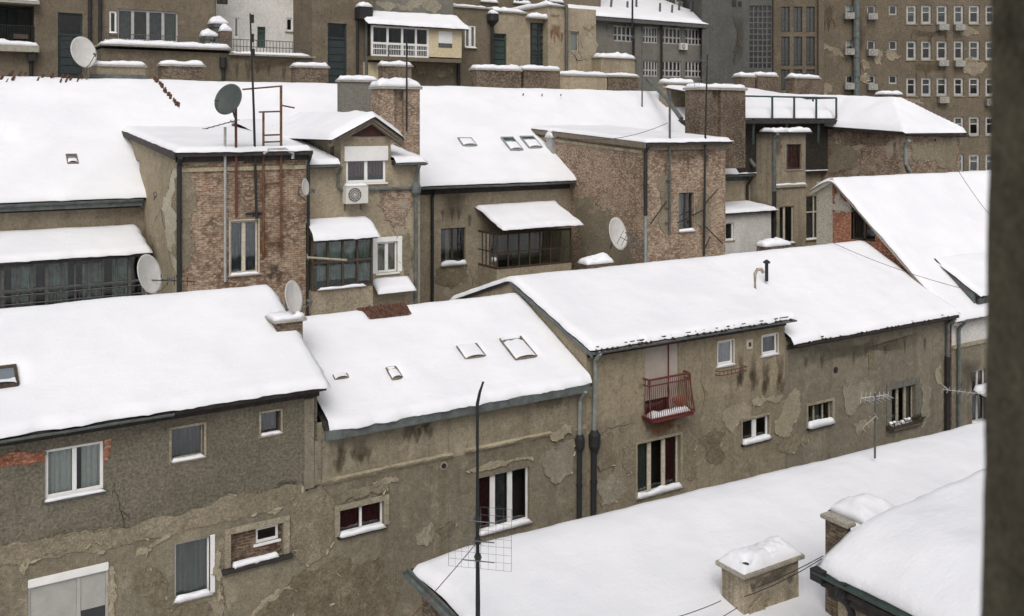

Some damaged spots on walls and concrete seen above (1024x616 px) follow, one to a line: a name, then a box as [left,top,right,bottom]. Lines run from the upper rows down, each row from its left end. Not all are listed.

spalling [860,49,901,84]
spalling [153,164,197,275]
flaking render [378,190,414,277]
flaking render [0,450,47,468]
spalling [466,431,576,485]
spalling [702,388,801,467]
spalling [842,380,875,435]
spalling [0,484,305,575]
spalling [156,548,223,616]
spalling [251,586,297,616]